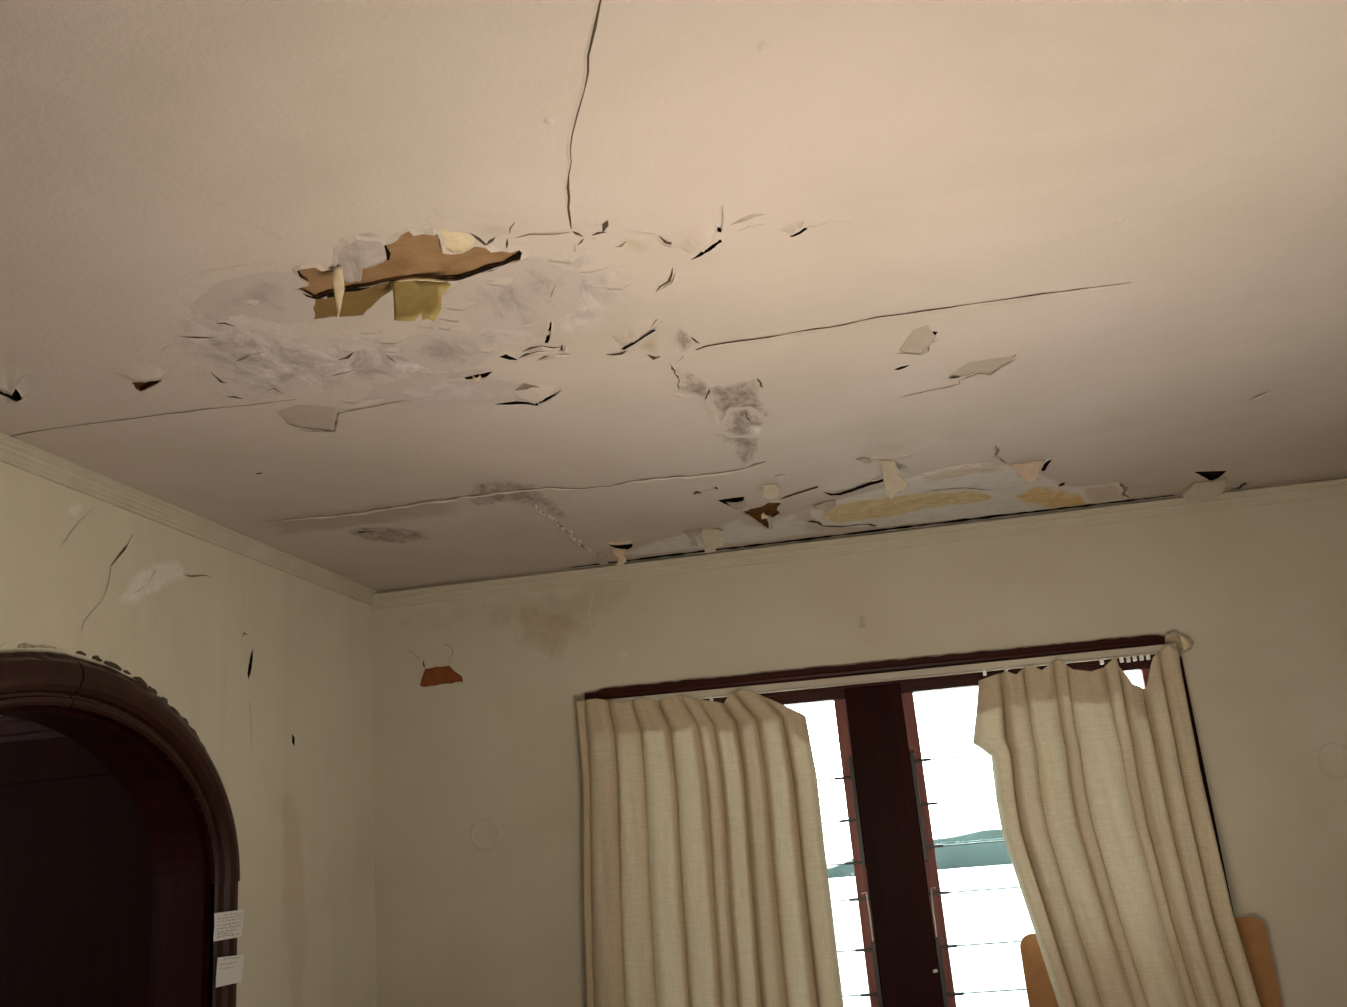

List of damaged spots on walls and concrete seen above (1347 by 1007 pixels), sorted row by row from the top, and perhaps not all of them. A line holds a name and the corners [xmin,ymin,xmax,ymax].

crack [516,0,681,292]
crack [11,399,296,438]
leakage [118,194,682,412]
peeling [291,222,529,322]
flaking render [662,323,780,470]
crack [695,283,1130,352]
peeling [899,325,937,355]
peeling [902,355,1016,397]
peeling [612,449,1134,567]
peeling [1182,471,1247,502]
crack [81,534,134,631]
flaking render [406,643,465,690]